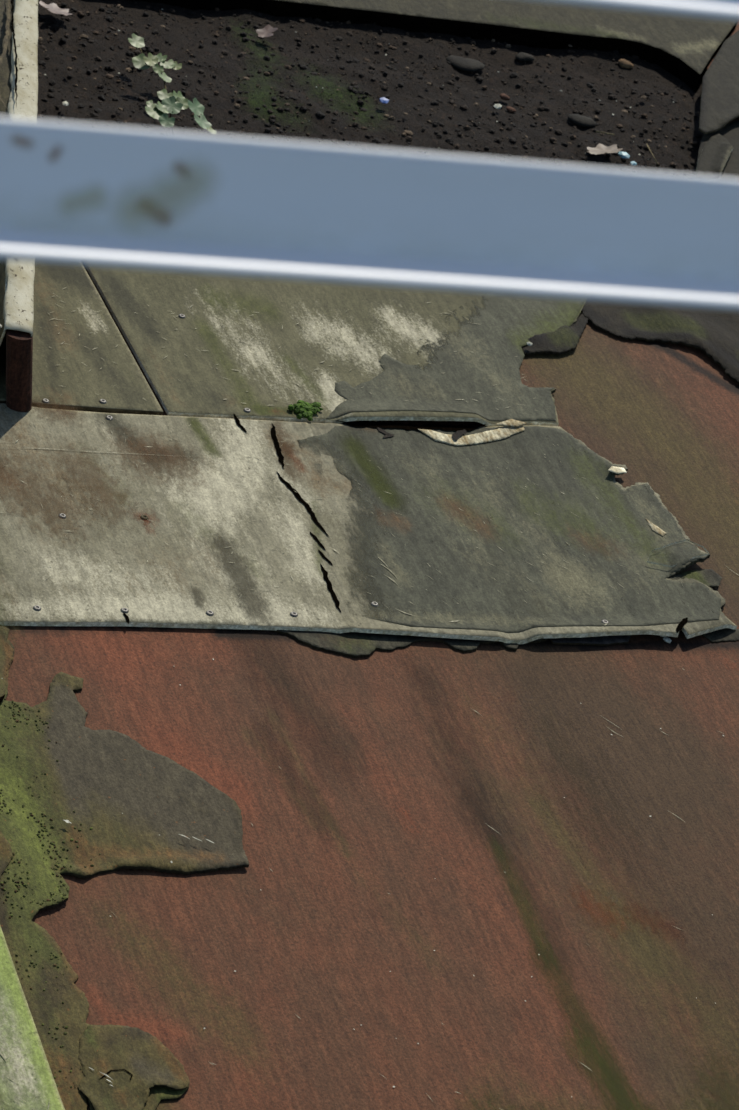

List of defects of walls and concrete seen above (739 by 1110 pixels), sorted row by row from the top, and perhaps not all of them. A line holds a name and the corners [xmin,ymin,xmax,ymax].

damp [214,536,267,619]
crack [233,413,341,612]
peeling [272,293,739,658]
peeling [0,625,249,1110]